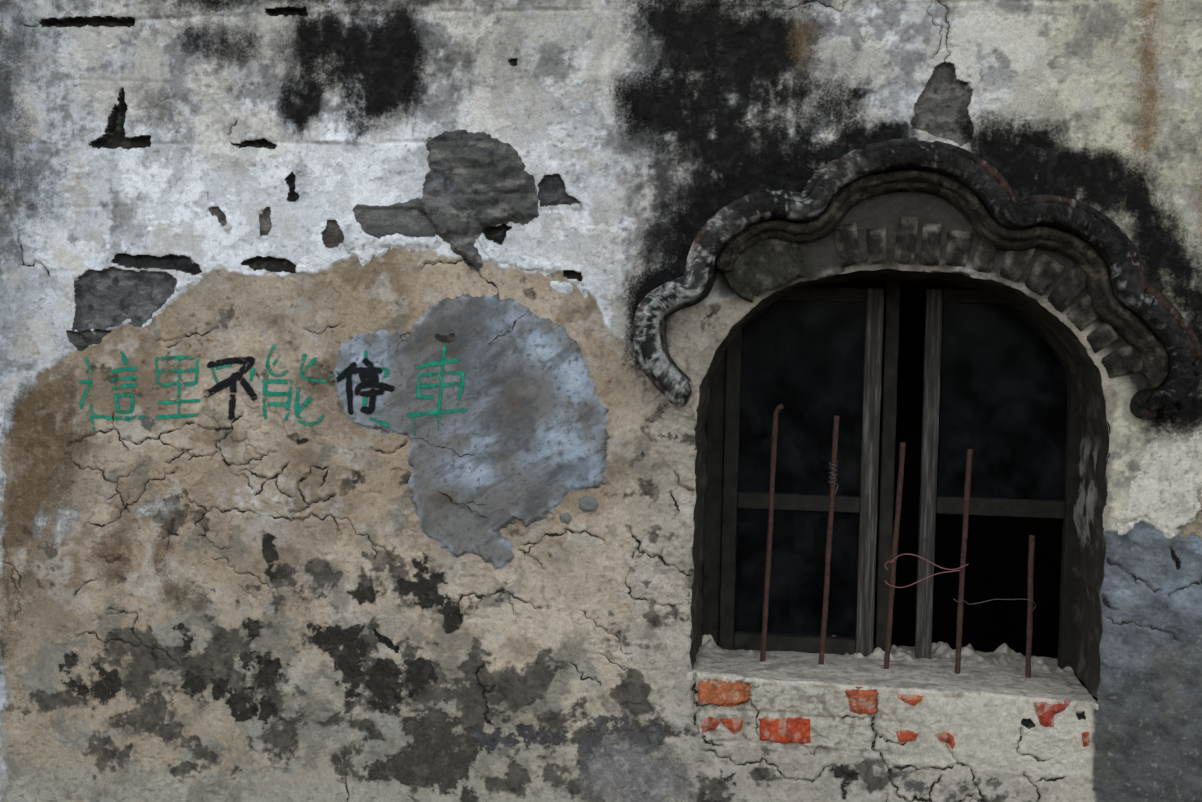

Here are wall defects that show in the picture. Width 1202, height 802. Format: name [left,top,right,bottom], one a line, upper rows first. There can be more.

leakage [277,0,429,136]
spalling [909,61,974,146]
spalling [66,253,208,351]
spalling [321,198,445,266]
leakage [609,0,919,370]
leakage [959,115,1202,438]
crack [73,414,392,599]
crack [518,529,691,607]
leakage [303,622,724,802]
spalling [690,676,1100,777]
crack [842,690,985,802]
crack [1016,730,1066,802]